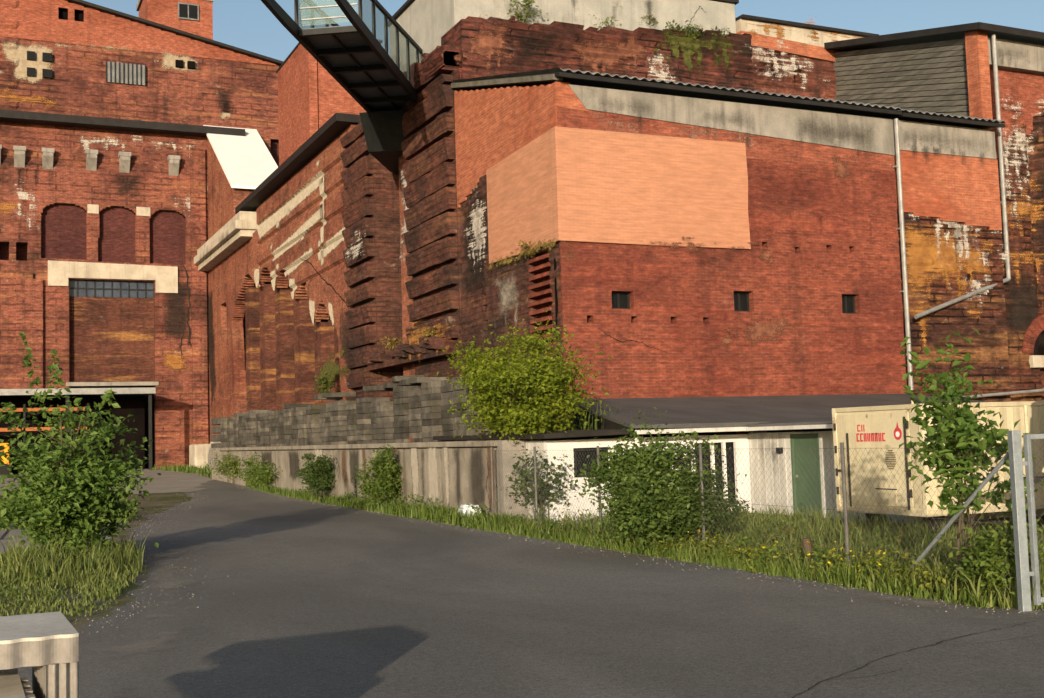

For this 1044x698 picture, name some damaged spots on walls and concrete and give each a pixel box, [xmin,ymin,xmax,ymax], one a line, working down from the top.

leakage [750,39,812,89]
leakage [996,99,1038,226]
leakage [345,231,366,258]
leakage [464,189,487,264]
leakage [933,219,1009,303]